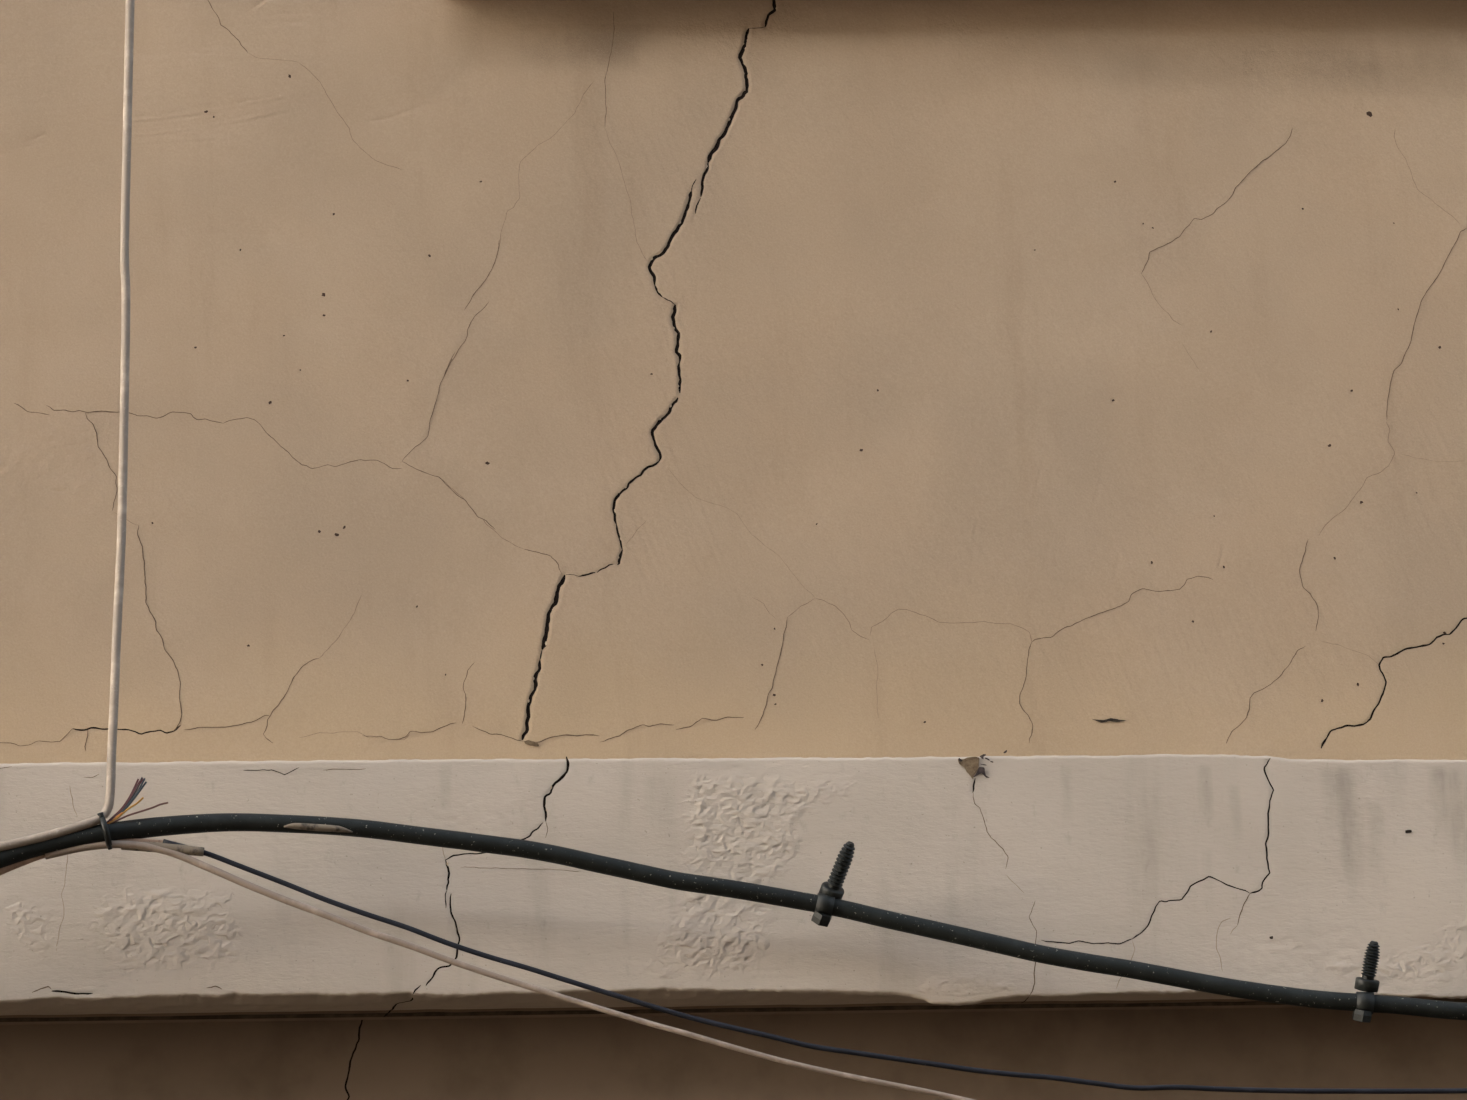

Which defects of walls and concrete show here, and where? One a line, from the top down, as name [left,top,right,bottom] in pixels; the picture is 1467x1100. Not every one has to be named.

crack [1141,128,1293,372]
crack [0,0,1213,840]
crack [1226,132,1467,749]
crack [345,847,578,1100]
spalling [958,750,1007,779]
crack [973,759,1274,1003]